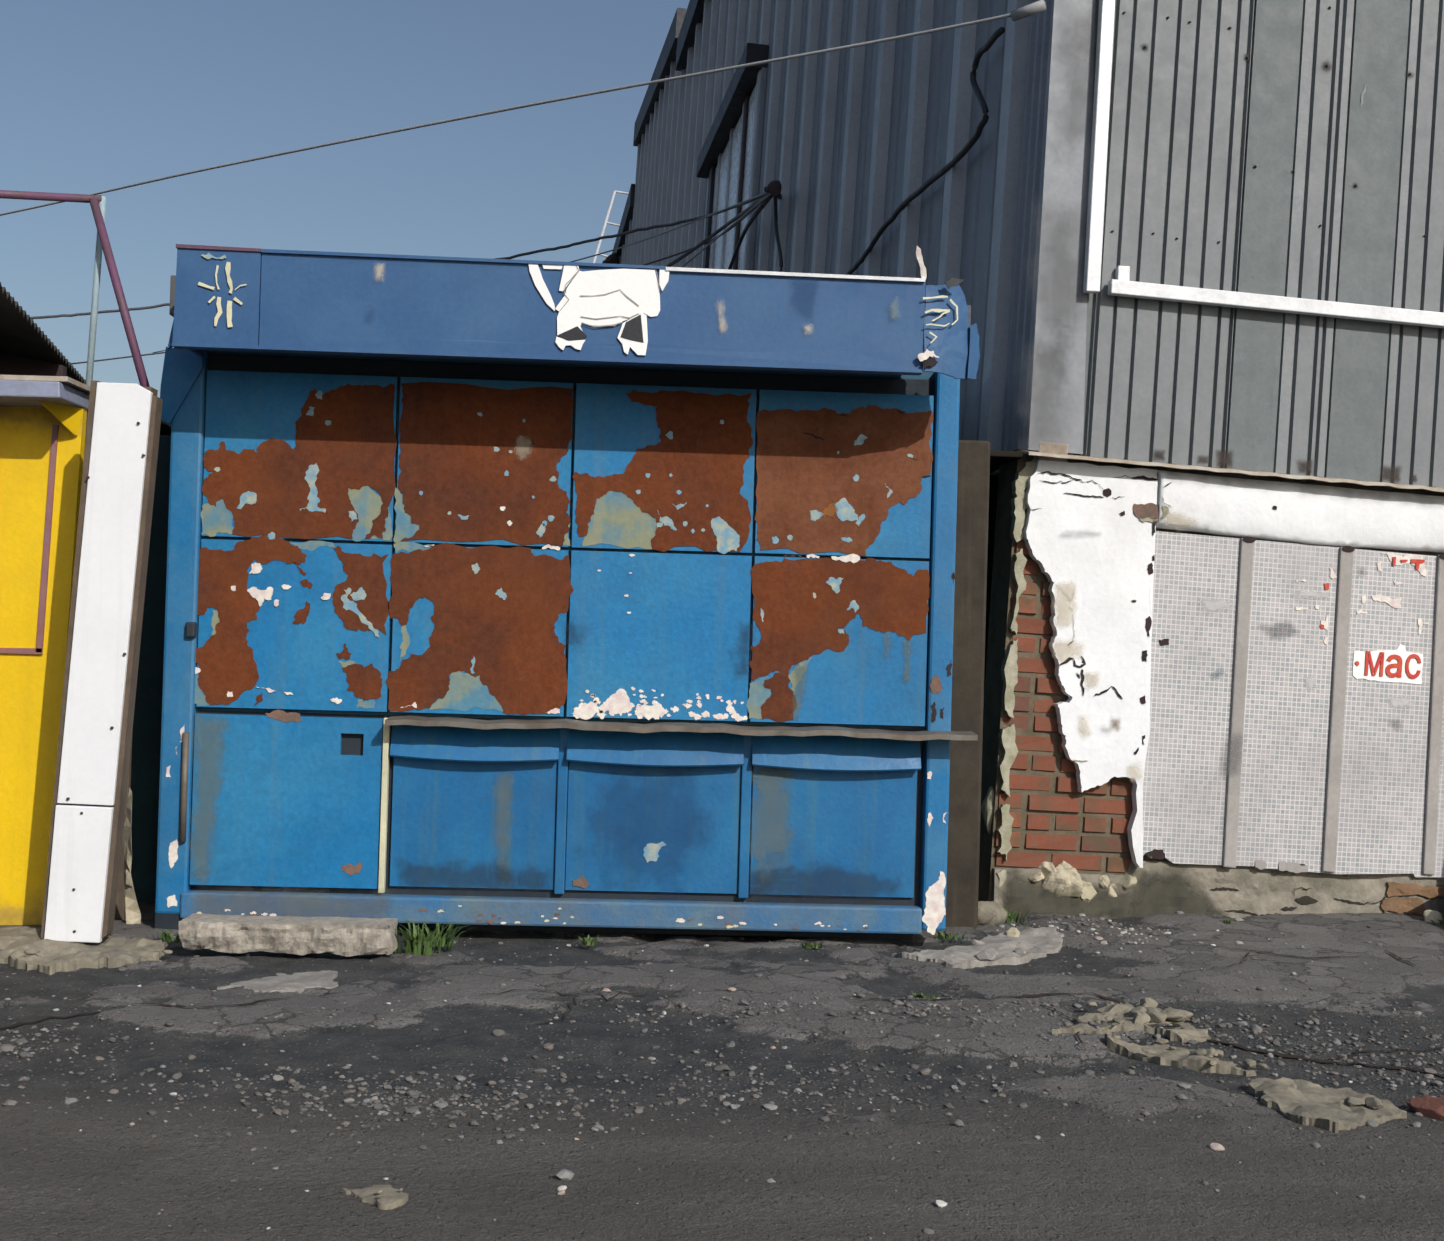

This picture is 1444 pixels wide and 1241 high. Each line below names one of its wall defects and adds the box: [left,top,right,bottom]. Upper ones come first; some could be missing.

crack [1032,471,1172,510]
rust [194,382,934,722]
peeling [573,686,748,722]
spalling [994,458,1170,887]
crack [1055,584,1123,699]
peeling [922,871,946,935]